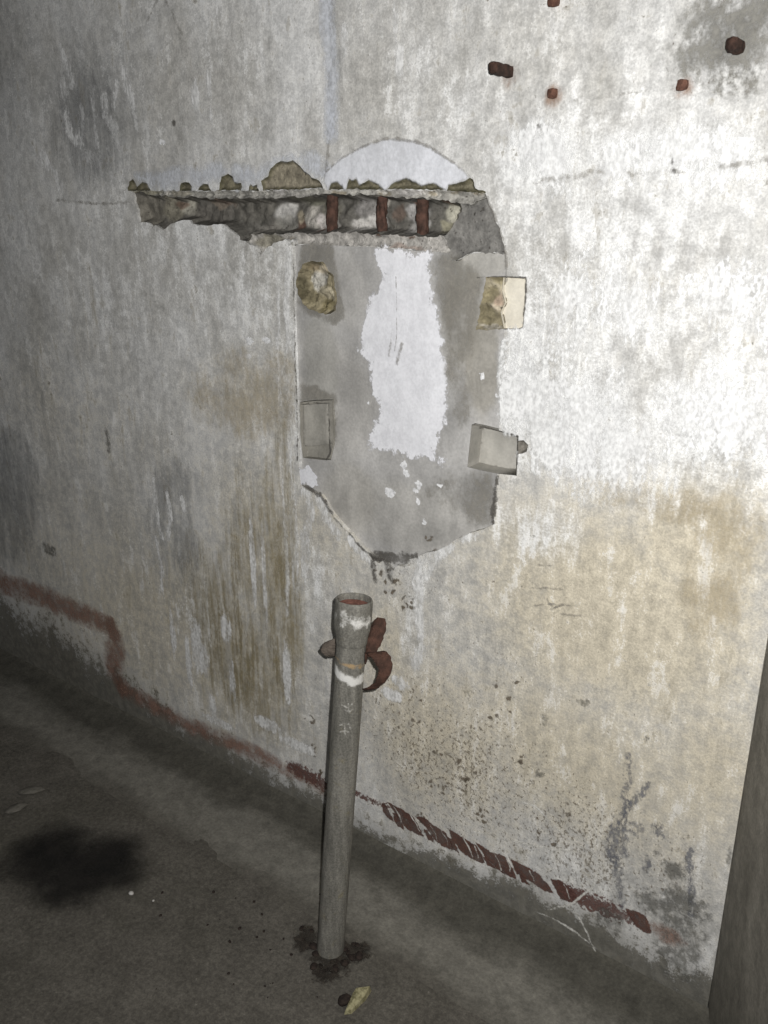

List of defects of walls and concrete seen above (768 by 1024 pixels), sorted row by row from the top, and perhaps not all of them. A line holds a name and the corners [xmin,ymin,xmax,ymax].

rust [326,195,339,232]
rust [376,196,388,237]
rust [415,199,429,235]
spalling [128,160,505,505]
damp [607,753,650,907]
damp [636,848,708,934]